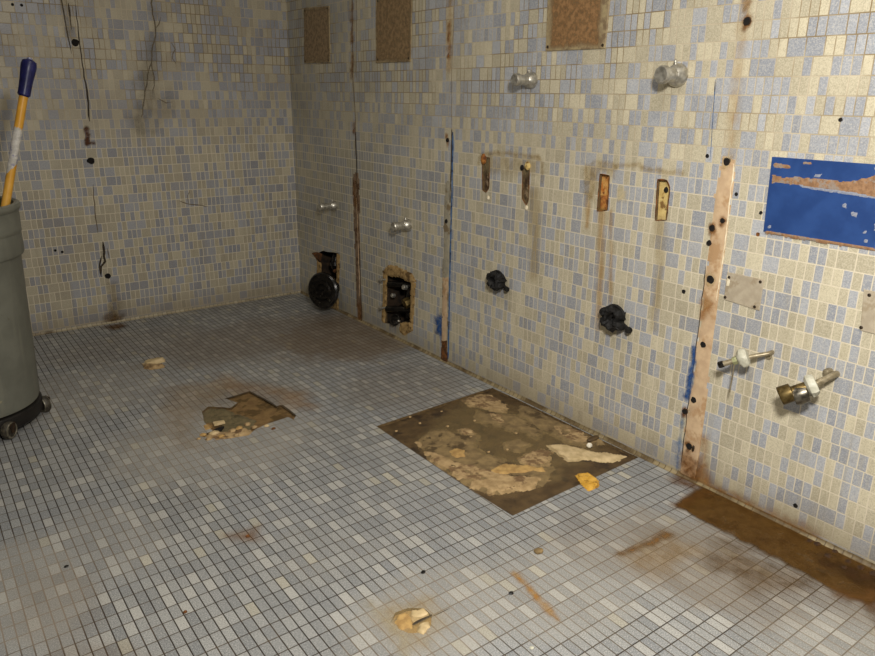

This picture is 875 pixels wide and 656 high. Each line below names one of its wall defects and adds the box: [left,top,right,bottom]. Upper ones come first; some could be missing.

crack [61,0,90,121]
crack [141,0,176,117]
peeling [772,163,875,217]
peeling [196,391,295,441]
peeling [380,390,635,516]
spalling [385,608,448,636]